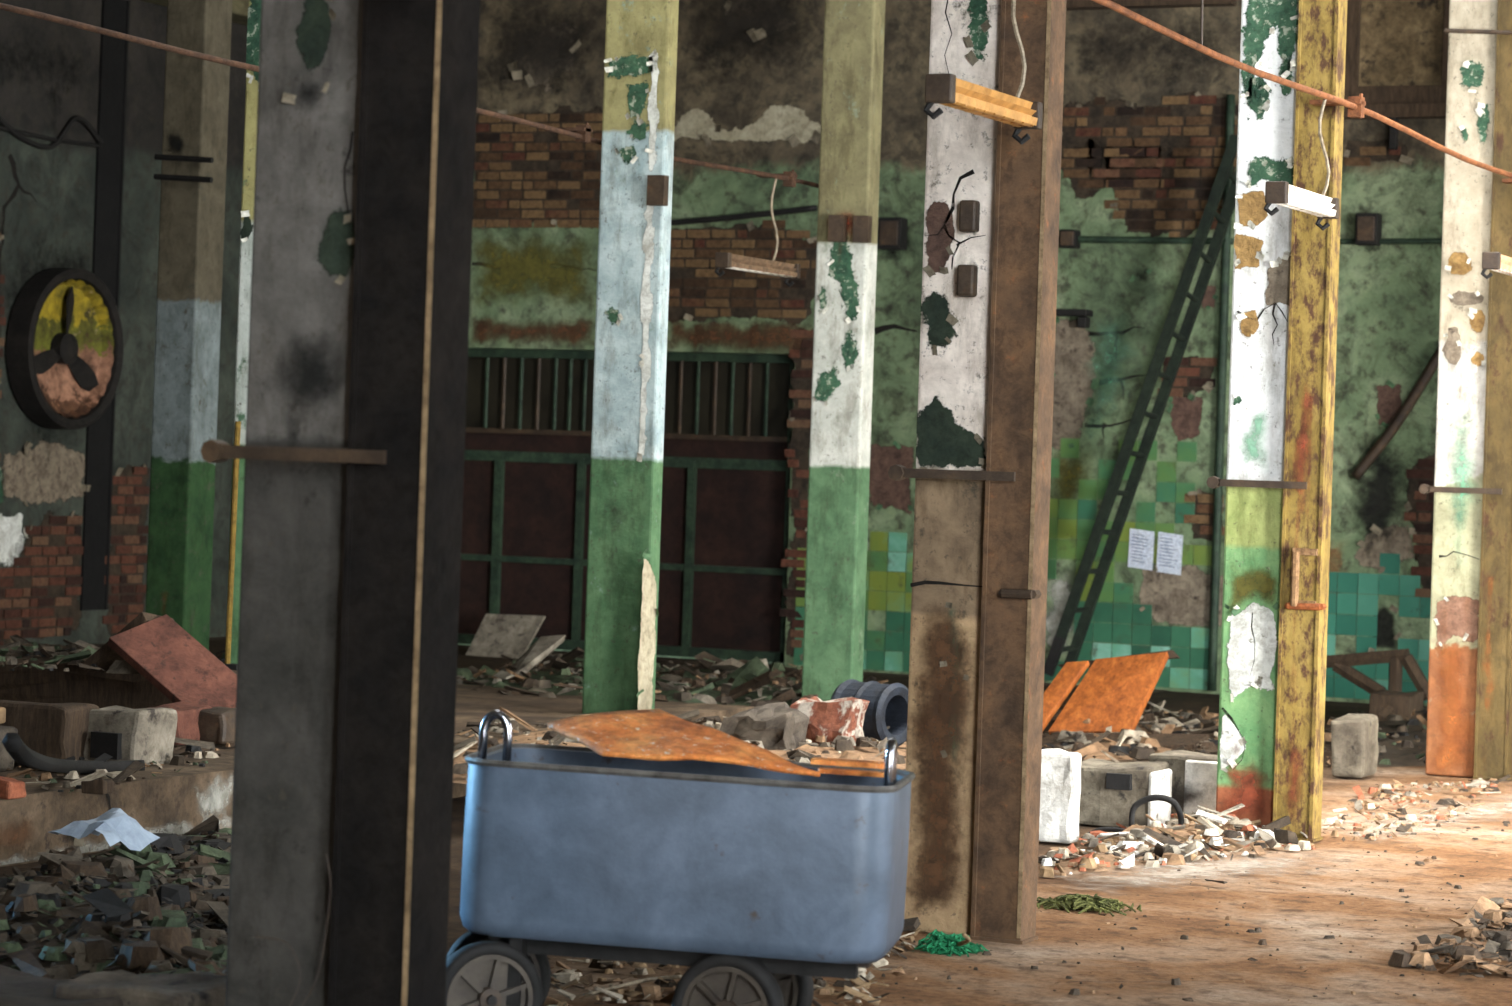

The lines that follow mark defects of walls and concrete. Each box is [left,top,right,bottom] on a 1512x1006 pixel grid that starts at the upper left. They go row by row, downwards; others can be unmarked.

flaking render [473,23,821,230]
flaking render [1061,0,1299,339]
peeling [1459,60,1491,144]
flaking render [920,201,959,356]
spalling [1442,252,1486,372]
flaking render [603,205,861,661]
flaking render [0,439,91,646]
flaking render [102,463,150,637]
peeling [1139,565,1280,773]